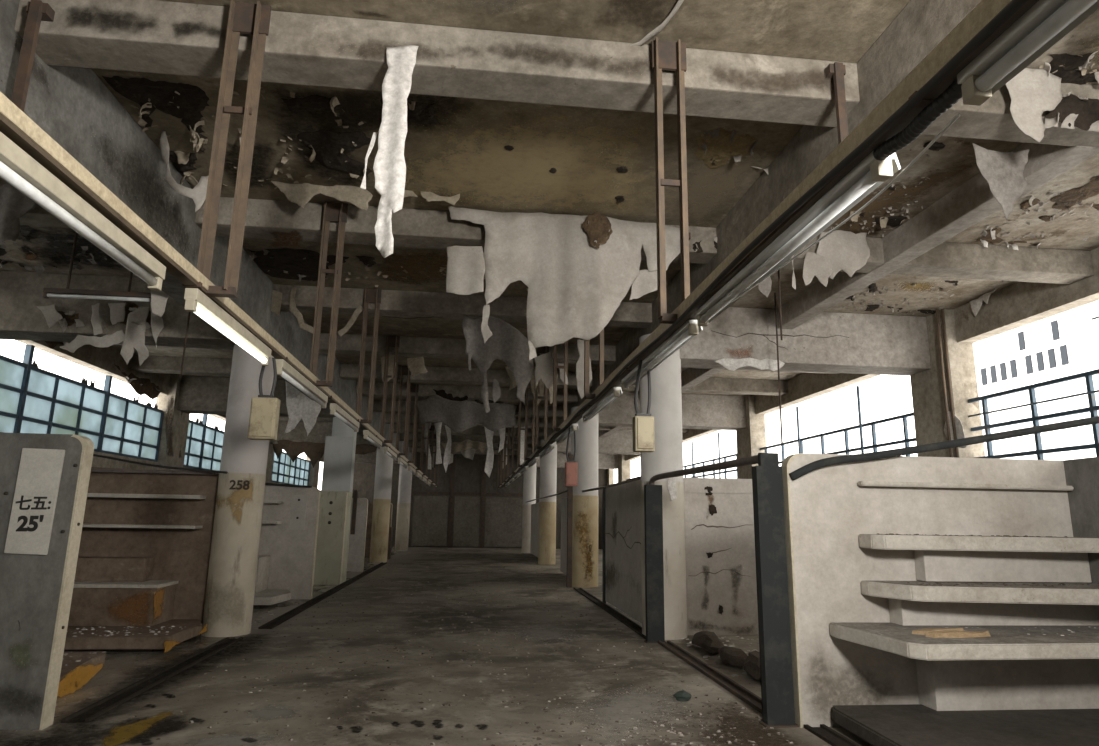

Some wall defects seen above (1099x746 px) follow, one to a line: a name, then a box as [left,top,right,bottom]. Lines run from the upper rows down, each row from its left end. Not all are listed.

leakage [70,8,155,31]
leakage [175,22,221,35]
leakage [352,43,394,58]
leakage [504,47,652,71]
leakage [715,69,834,92]
spalling [102,76,215,212]
spalling [923,141,945,157]
peeling [959,51,1099,250]
peeling [791,159,930,290]
peeling [248,45,717,478]
peeling [36,290,169,399]
corrosion [576,514,594,575]